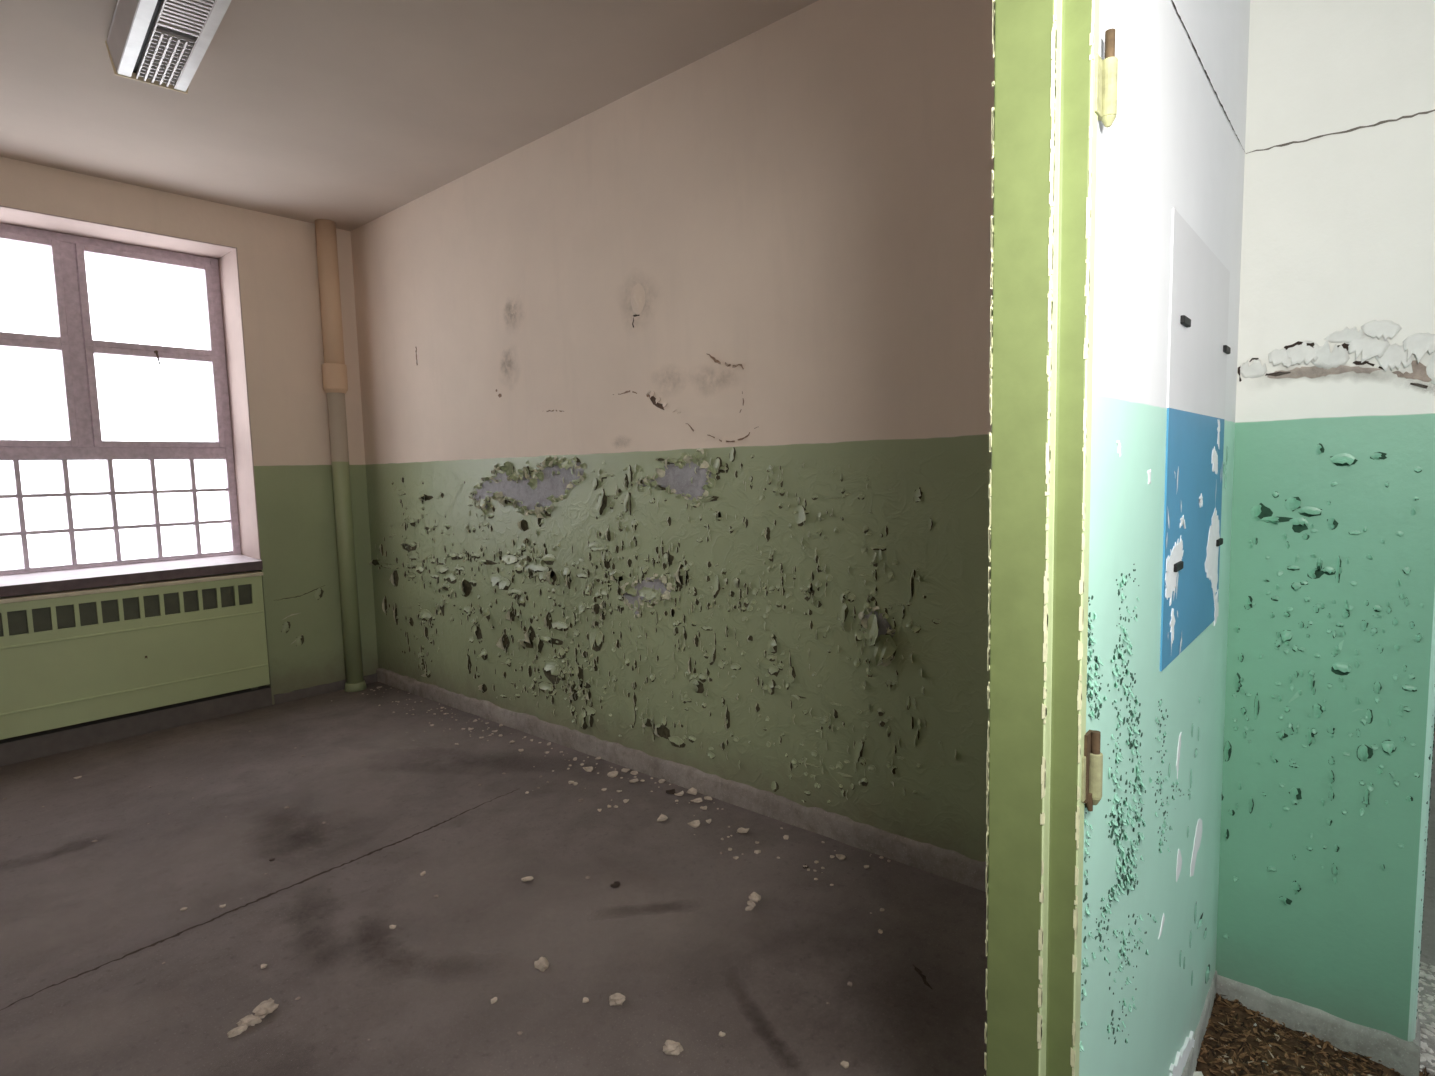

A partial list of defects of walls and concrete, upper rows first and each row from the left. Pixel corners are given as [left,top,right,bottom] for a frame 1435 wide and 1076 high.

crack [1172,1,1435,154]
spalling [369,448,941,803]
peeling [1080,564,1202,1052]
spalling [1169,1031,1203,1076]
peeling [1279,881,1301,905]
peeling [1221,443,1435,884]